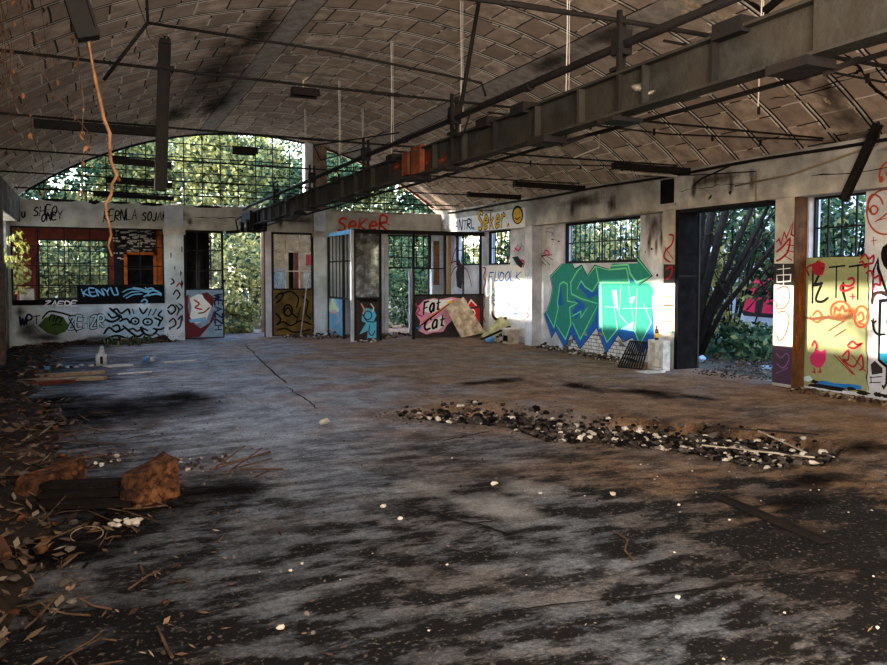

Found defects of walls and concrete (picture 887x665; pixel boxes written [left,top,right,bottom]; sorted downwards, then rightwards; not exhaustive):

water stain [646,214,663,252]
crack [245,344,328,408]